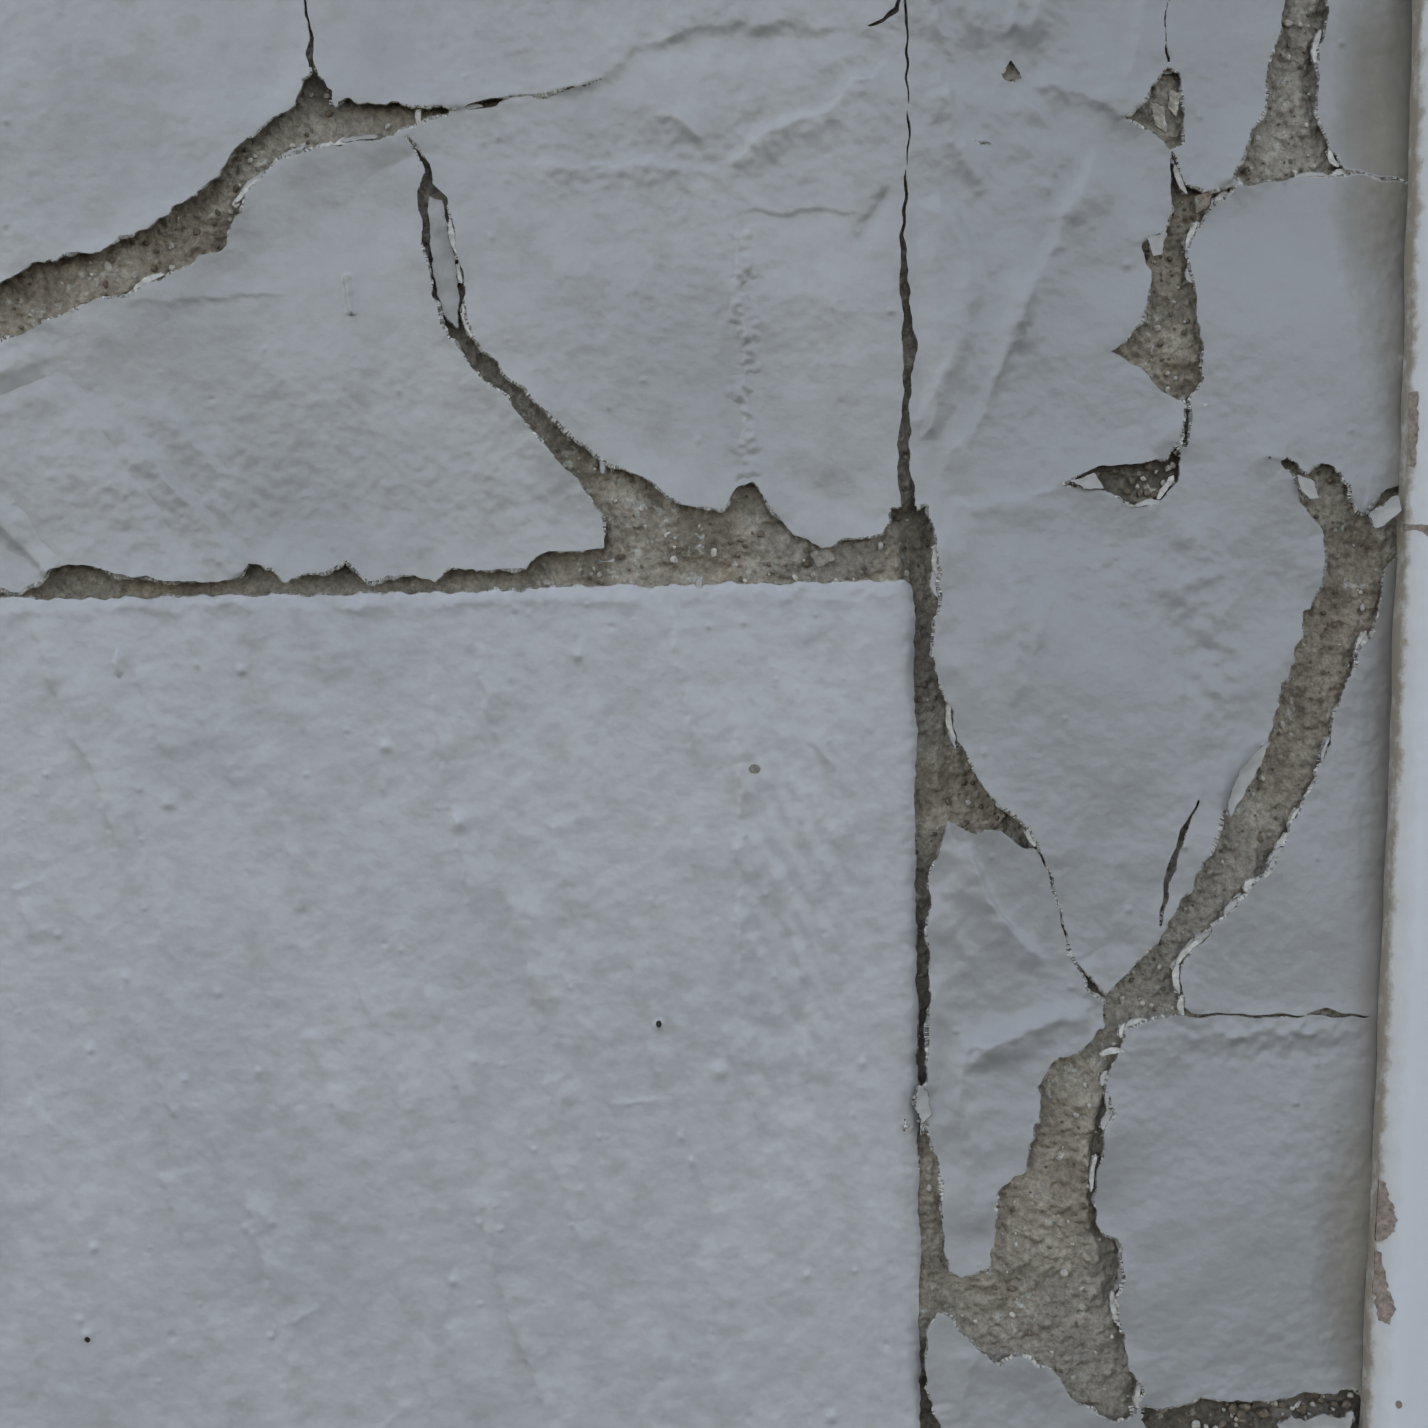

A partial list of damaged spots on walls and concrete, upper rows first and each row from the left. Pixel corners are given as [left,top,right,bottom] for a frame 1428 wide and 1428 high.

peeling [0,67,602,342]
crack [866,0,918,516]
peeling [1112,0,1408,457]
spalling [574,442,1428,1428]